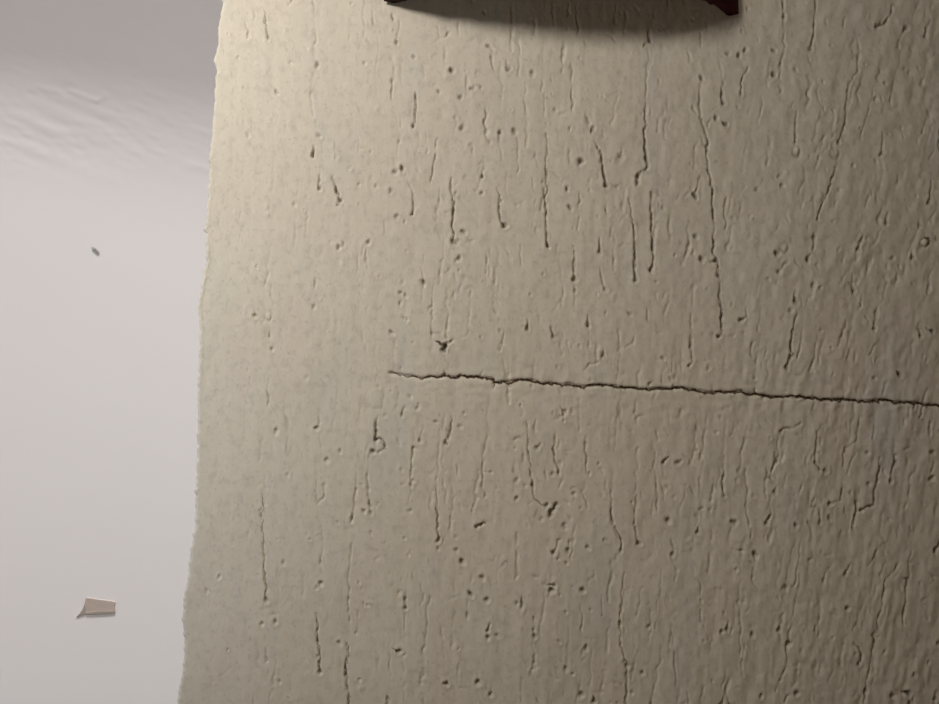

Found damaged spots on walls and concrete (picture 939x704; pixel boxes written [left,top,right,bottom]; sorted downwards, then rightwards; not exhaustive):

crack [393,371,939,407]